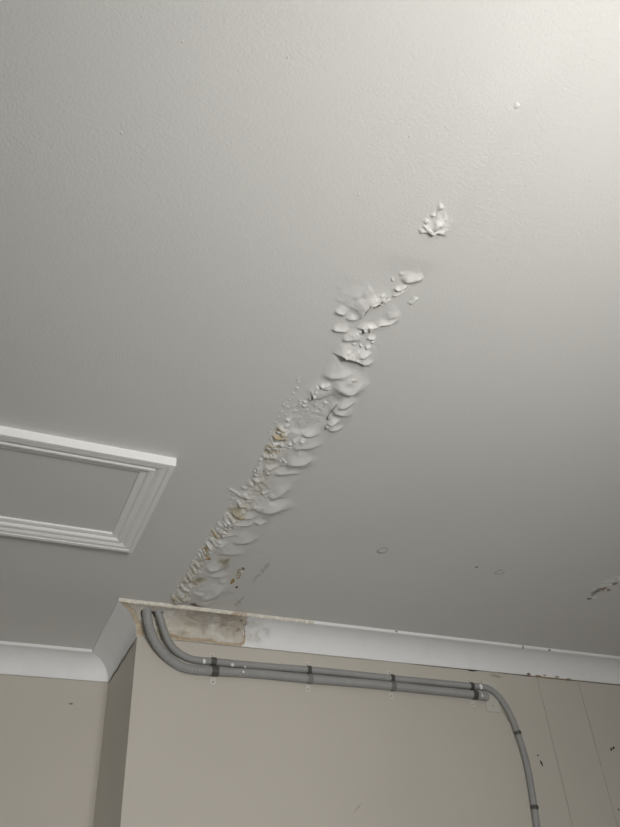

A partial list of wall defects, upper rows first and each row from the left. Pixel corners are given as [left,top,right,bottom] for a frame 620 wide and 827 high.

water stain [119,596,314,646]